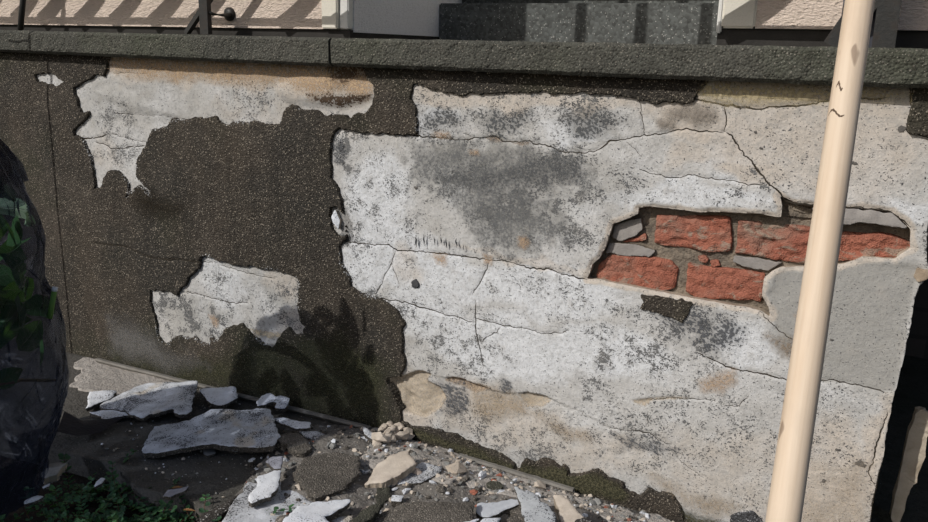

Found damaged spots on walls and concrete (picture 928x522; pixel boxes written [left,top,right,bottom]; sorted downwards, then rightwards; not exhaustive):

peeling [37,73,64,86]
peeling [76,57,372,192]
crack [388,99,830,206]
crack [846,206,910,227]
peeling [152,256,305,347]
crack [346,241,587,369]
peeling [331,81,832,522]
peeling [801,86,928,522]
damp [432,379,522,418]
damp [608,432,679,459]
crack [699,353,787,380]
crack [821,379,888,485]